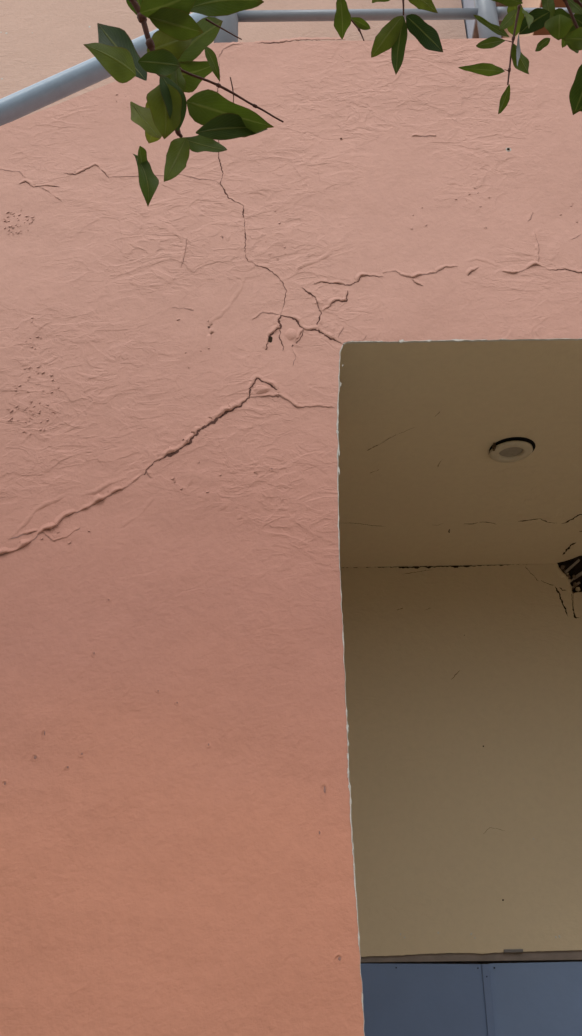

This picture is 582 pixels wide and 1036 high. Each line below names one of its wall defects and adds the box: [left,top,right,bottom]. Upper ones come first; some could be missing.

crack [216,37,345,94]
crack [412,131,436,139]
crack [0,140,582,555]
crack [348,564,578,618]